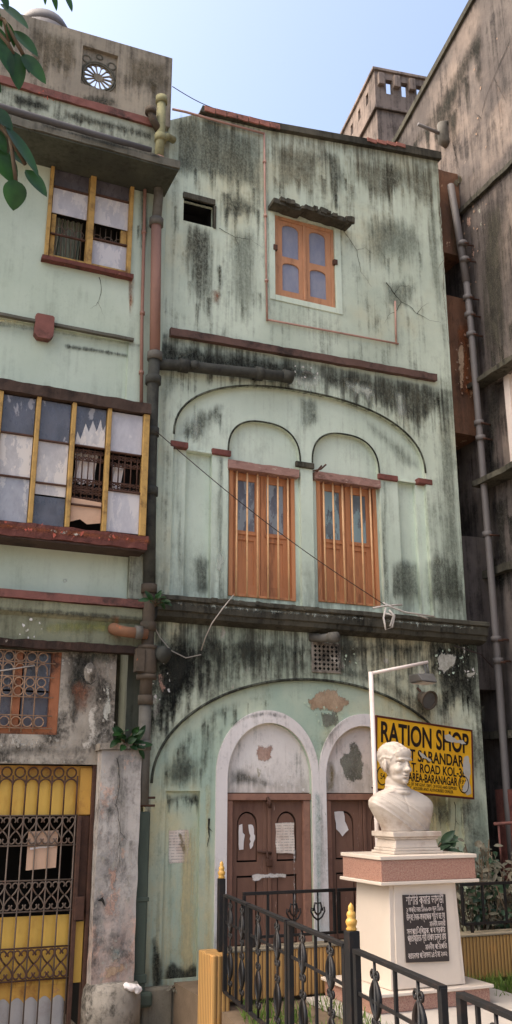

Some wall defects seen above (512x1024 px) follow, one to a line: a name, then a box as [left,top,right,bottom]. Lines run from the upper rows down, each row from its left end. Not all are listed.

damp [281,152,431,201]
crack [343,43,509,342]
damp [162,345,448,422]
damp [384,559,462,600]
damp [151,638,297,735]
spalling [304,684,352,732]
peeling [435,647,477,680]
damp [172,745,191,780]
peeling [257,746,273,762]